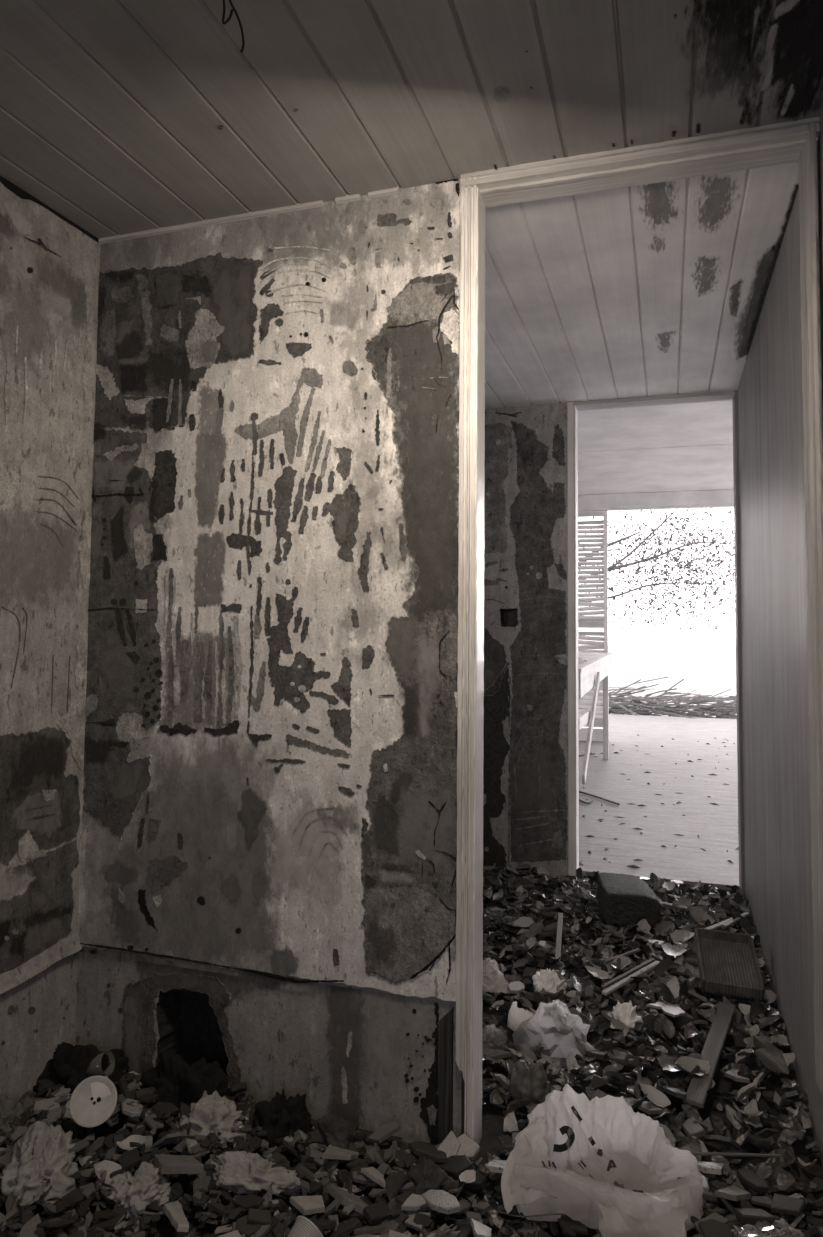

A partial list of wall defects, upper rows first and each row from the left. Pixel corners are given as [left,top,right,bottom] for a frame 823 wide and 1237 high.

damp [685,0,823,124]
damp [737,184,799,360]
peeling [0,198,460,985]
peeling [483,421,568,868]
crack [80,943,344,984]